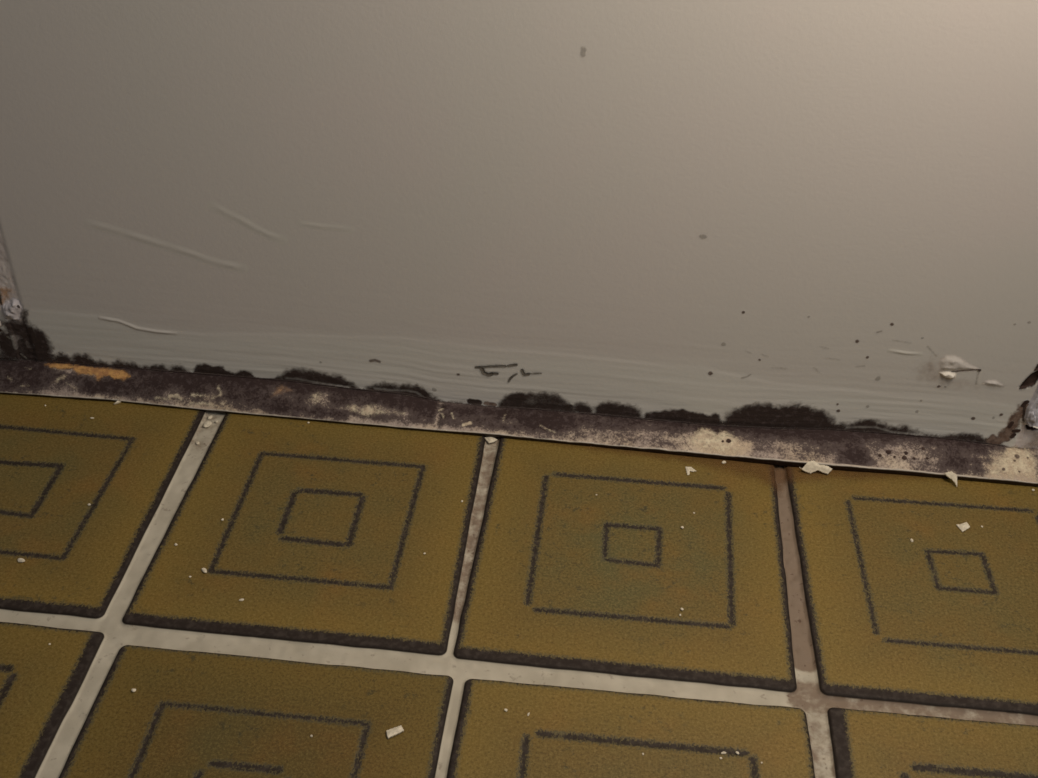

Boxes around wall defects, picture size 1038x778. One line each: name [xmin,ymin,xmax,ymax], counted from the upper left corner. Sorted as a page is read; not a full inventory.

water stain [0,311,1029,477]